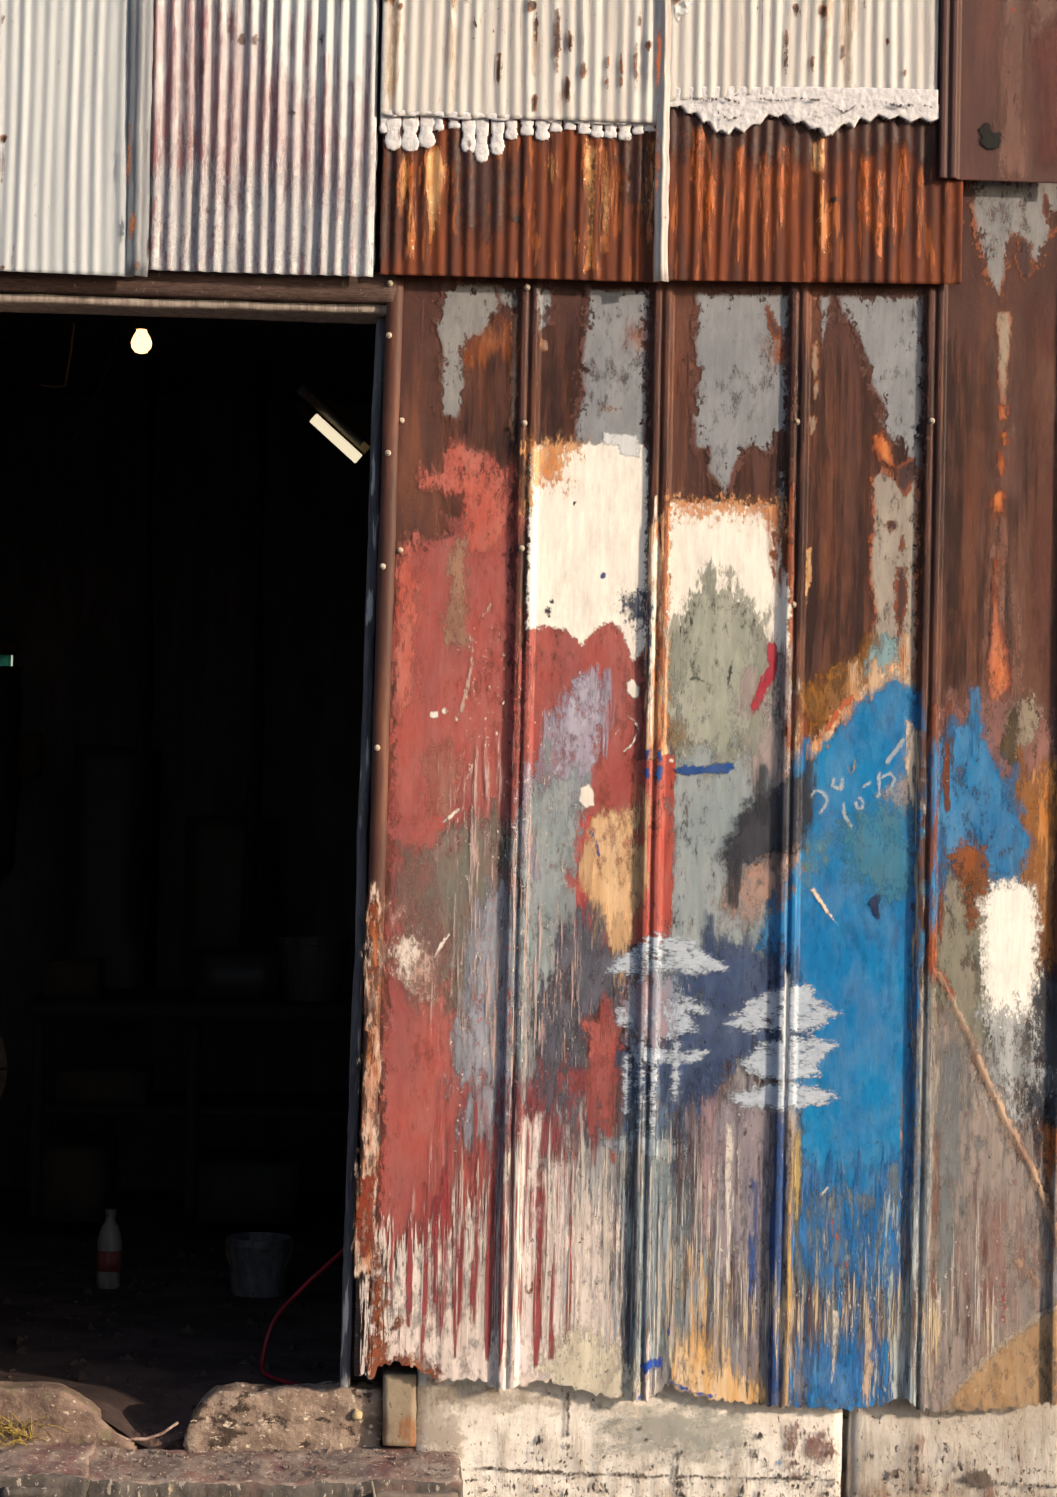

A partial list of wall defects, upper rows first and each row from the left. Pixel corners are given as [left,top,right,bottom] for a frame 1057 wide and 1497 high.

rust [998,0,1057,180]
rust [380,129,517,262]
rust [573,97,940,274]
peeling [431,277,661,450]
rust [445,305,649,568]
peeling [682,281,942,716]
peeling [963,180,1057,521]
peeling [439,535,471,649]
peeling [421,737,470,818]
peeling [354,882,839,1497]
peeling [868,1184,929,1406]
spalling [104,1420,188,1450]